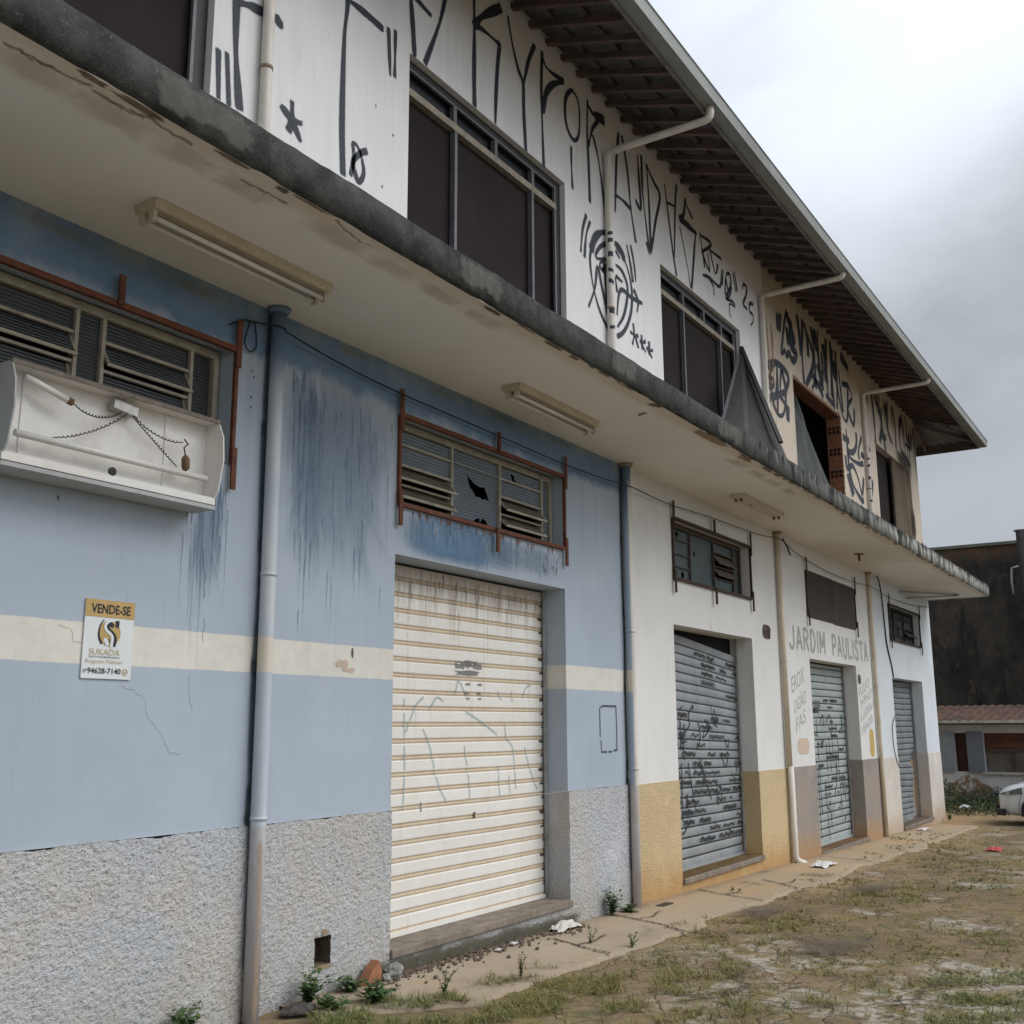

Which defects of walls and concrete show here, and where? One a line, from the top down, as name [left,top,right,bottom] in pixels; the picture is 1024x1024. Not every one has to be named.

peeling [335,648,355,673]